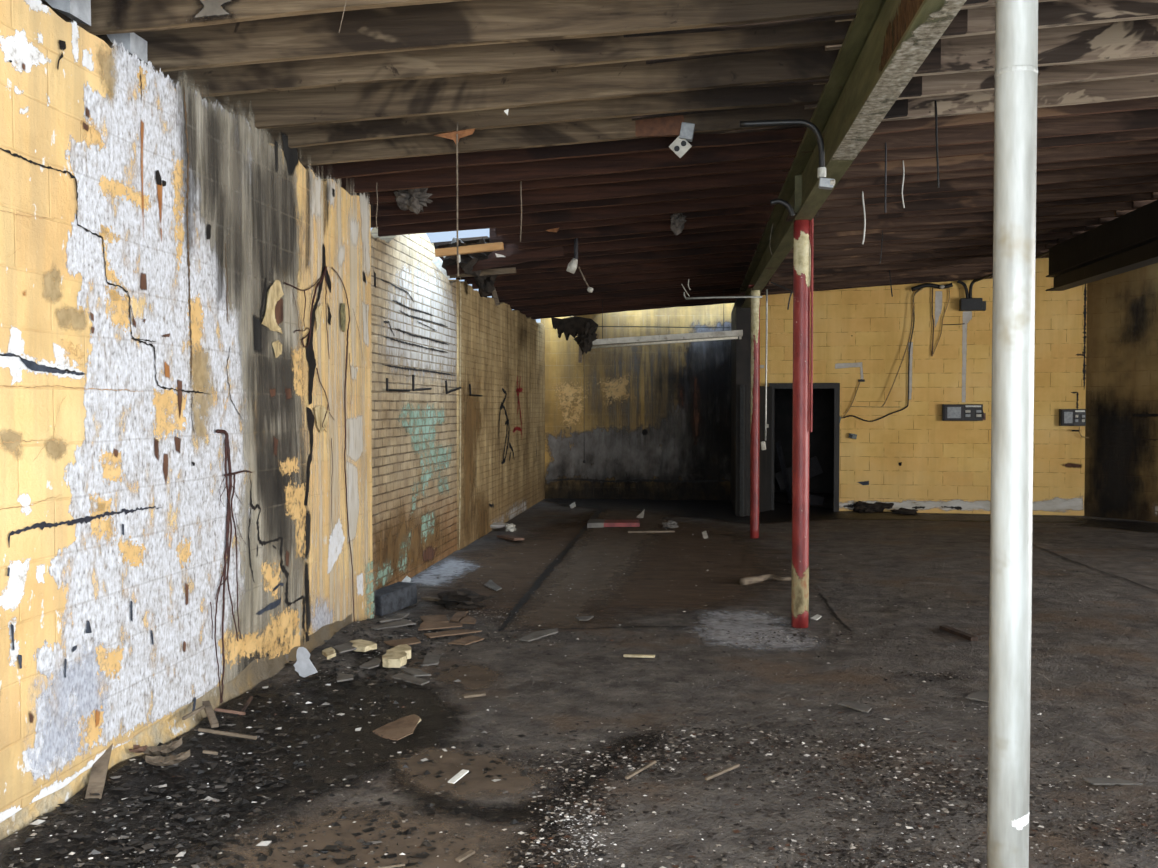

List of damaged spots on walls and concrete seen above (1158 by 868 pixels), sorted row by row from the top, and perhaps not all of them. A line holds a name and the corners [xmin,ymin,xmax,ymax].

peeling [25,0,50,13]
peeling [338,193,376,288]
crack [0,495,161,547]
crack [0,148,332,506]
peeling [0,16,337,823]
water stain [182,86,333,669]
peeling [327,415,363,575]
water stain [552,340,730,444]